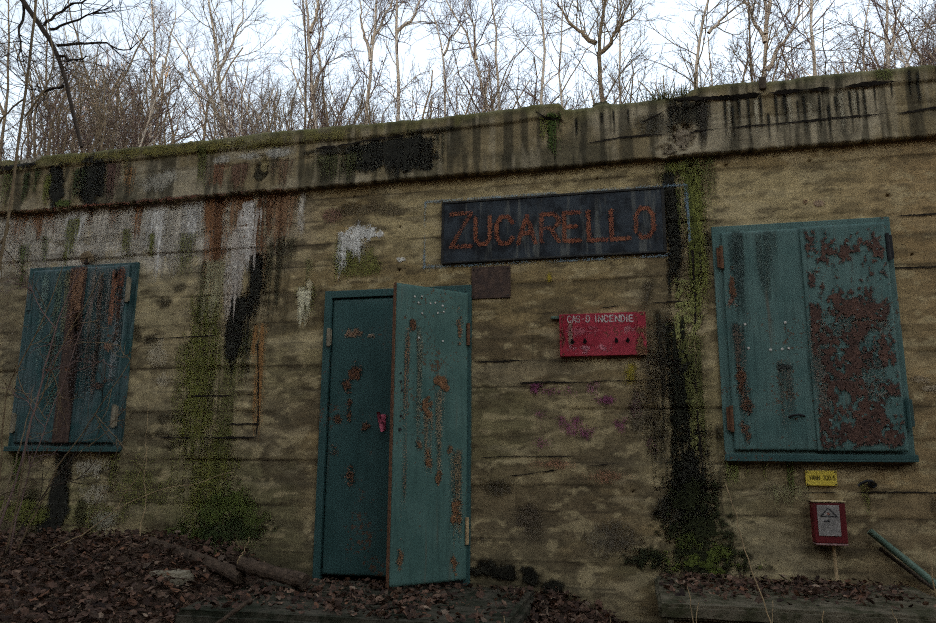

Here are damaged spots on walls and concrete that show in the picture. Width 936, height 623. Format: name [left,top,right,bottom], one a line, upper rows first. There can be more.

leakage [0,165,211,286]
leakage [197,145,230,181]
corrosion [203,159,297,282]
leakage [241,148,290,159]
leakage [298,191,306,230]
leakage [669,94,711,140]
leakage [723,87,876,137]
corrosion [69,267,125,411]
leakage [174,201,294,481]
corrosion [404,319,462,531]
leakage [646,311,739,534]